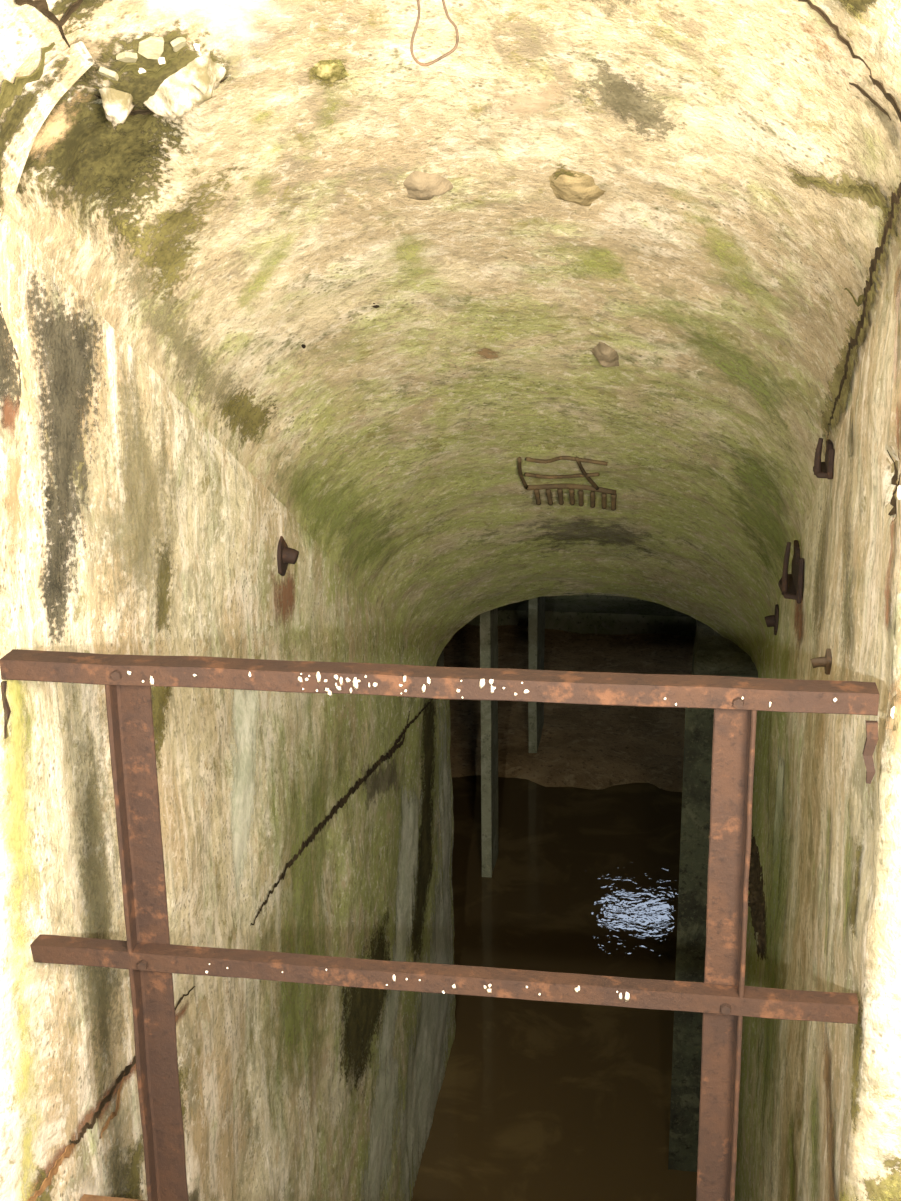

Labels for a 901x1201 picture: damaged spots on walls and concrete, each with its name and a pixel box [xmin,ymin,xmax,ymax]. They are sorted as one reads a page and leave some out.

crack [0,0,83,118]
spalling [83,21,233,128]
crack [798,0,901,122]
crack [795,173,901,438]
water stain [0,266,185,645]
rust [794,601,803,656]
rust [885,518,894,628]